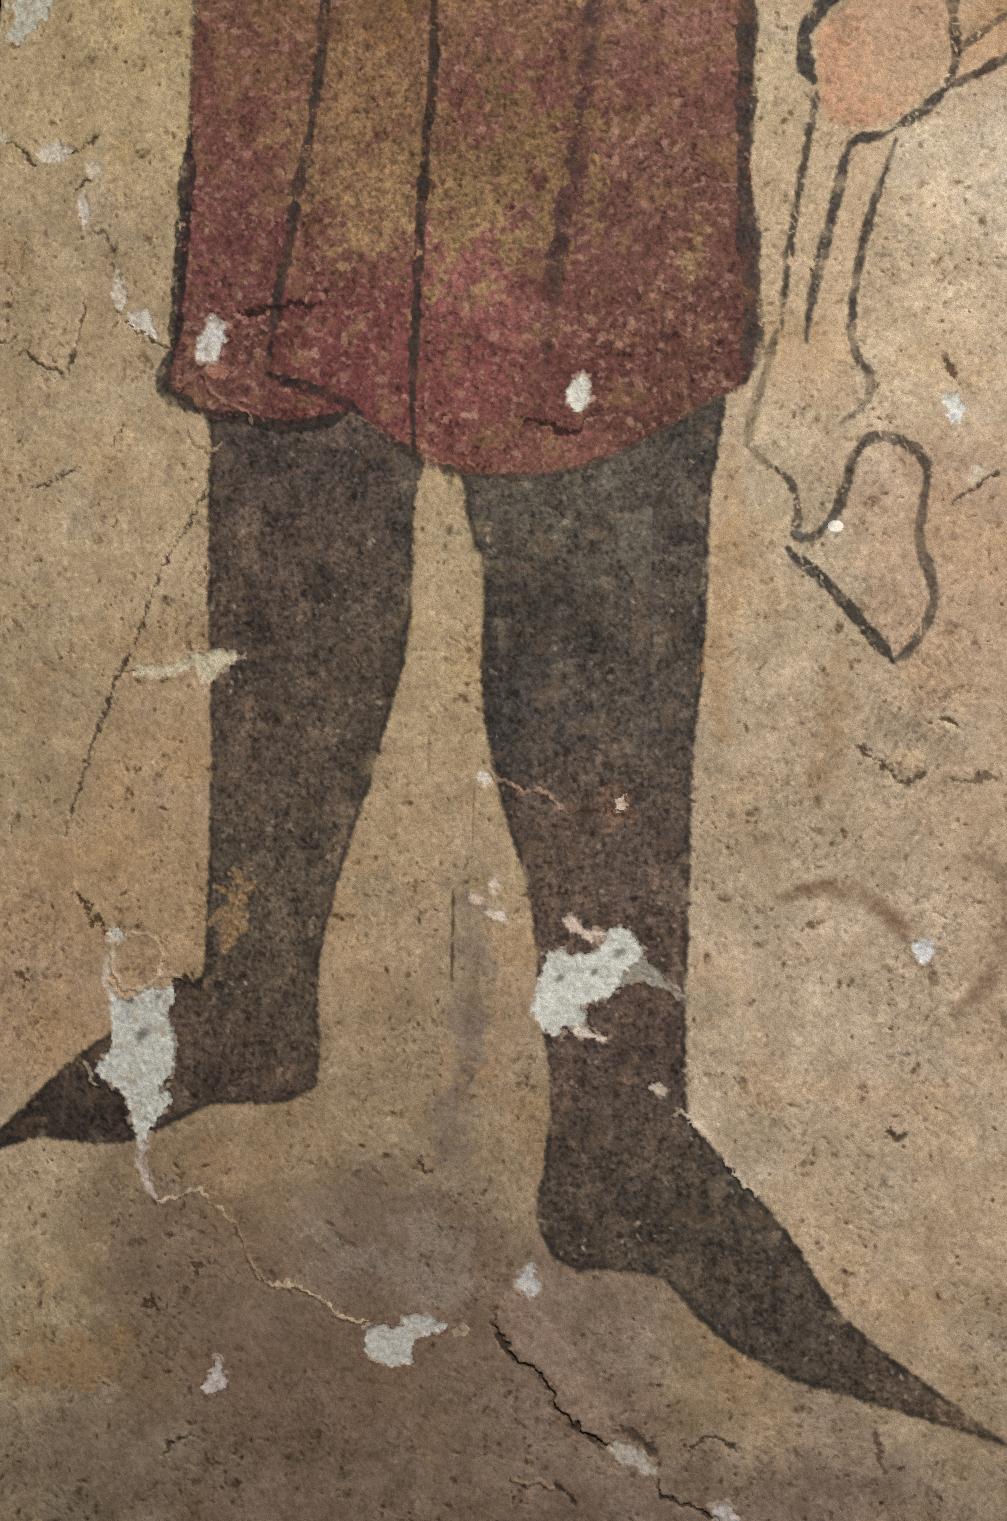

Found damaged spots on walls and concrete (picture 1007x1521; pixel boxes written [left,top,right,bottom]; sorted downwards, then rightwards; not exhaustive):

spalling [193,312,231,380]
spalling [564,369,597,415]
crack [63,225,254,838]
spalling [114,644,247,687]
spalling [526,912,687,1045]
spalling [69,891,203,1149]
crack [133,1139,369,1324]
spalling [512,1259,544,1299]
spalling [361,1311,470,1368]
spalling [200,1353,229,1396]
crack [604,1425,742,1521]
crack [871,1428,888,1481]